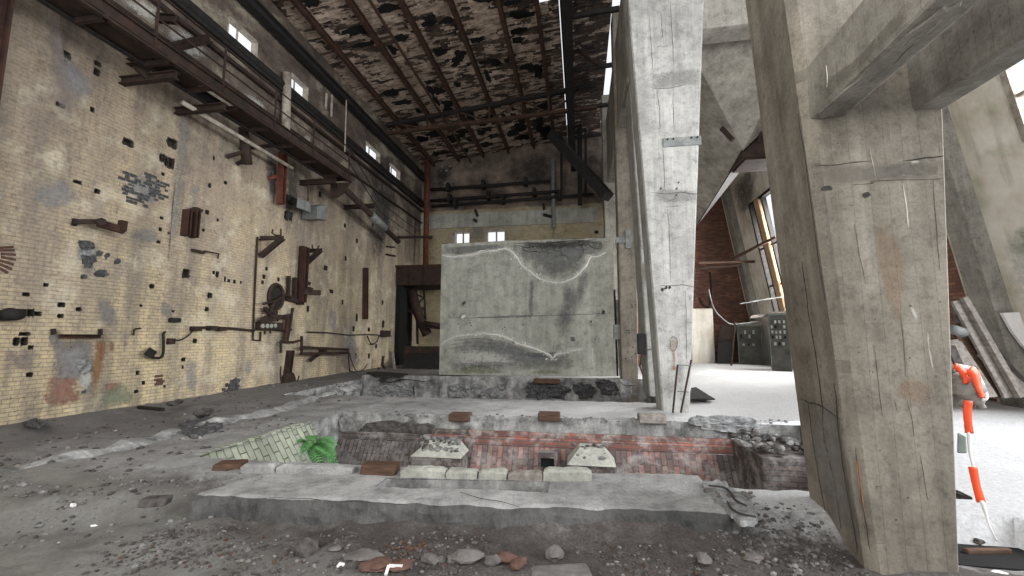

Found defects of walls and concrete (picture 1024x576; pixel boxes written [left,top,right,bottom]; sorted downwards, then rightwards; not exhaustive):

spalling [118,136,178,208]
spalling [77,240,121,279]
damp [443,227,606,324]
crack [798,116,945,554]
spalling [284,375,656,403]